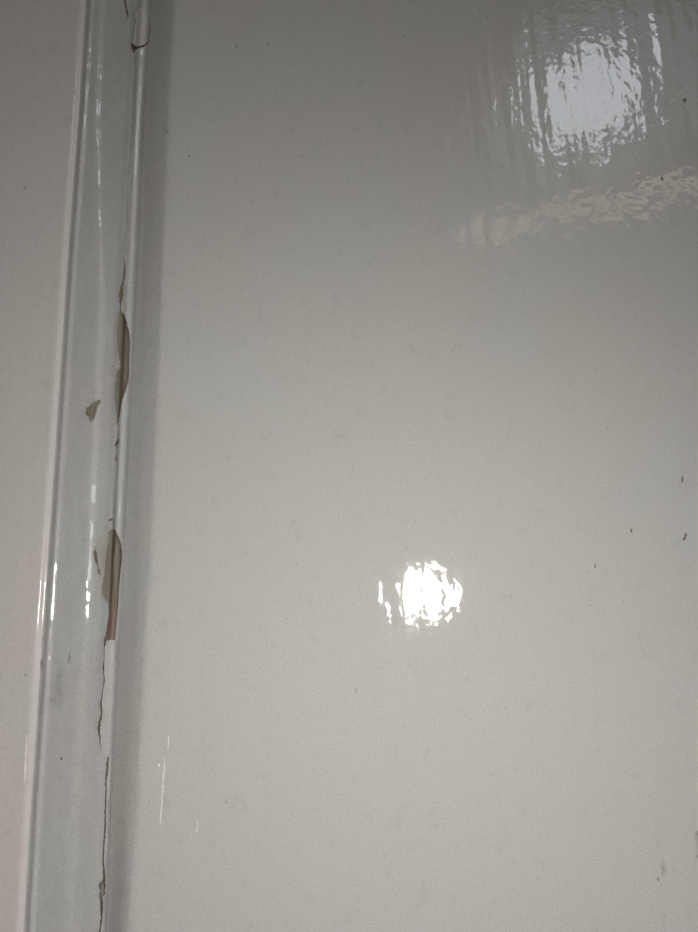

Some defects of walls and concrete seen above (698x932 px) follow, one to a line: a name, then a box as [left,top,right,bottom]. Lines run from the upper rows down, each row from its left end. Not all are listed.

peeling [124,0,151,53]
peeling [85,400,101,422]
peeling [111,312,130,424]
peeling [94,529,122,648]
crack [97,648,109,932]